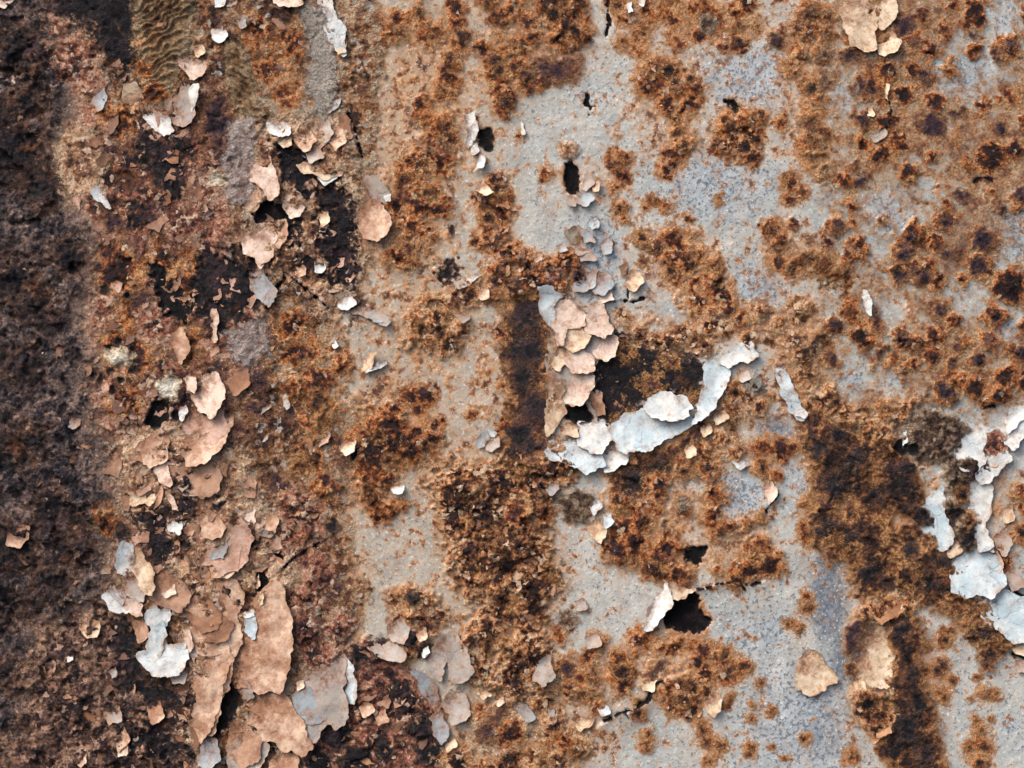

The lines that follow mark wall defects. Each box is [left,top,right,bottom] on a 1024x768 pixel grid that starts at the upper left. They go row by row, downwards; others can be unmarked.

spalling [146,99,392,364]
peeling [317,0,347,57]
peeling [464,111,494,172]
spalling [563,160,581,195]
corrosion [0,0,767,768]
peeling [432,216,759,544]
corrosion [595,0,1024,768]
peeling [79,364,390,768]
peeling [367,618,557,752]
spalling [643,579,713,634]
crack [696,581,761,591]
peeling [920,397,1024,673]